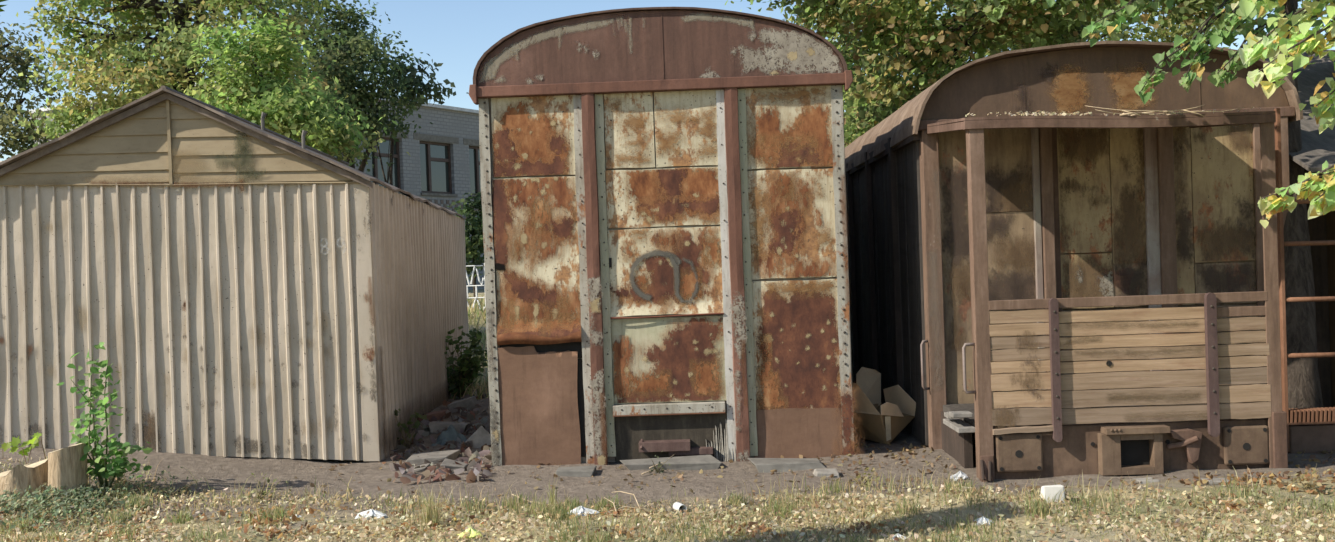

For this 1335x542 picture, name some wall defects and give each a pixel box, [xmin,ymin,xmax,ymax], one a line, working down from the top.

peeling [731,28,842,76]
corrosion [492,101,581,345]
corrosion [605,101,723,403]
corrosion [747,87,857,455]
leakage [1058,128,1147,296]
leakage [1174,124,1256,263]